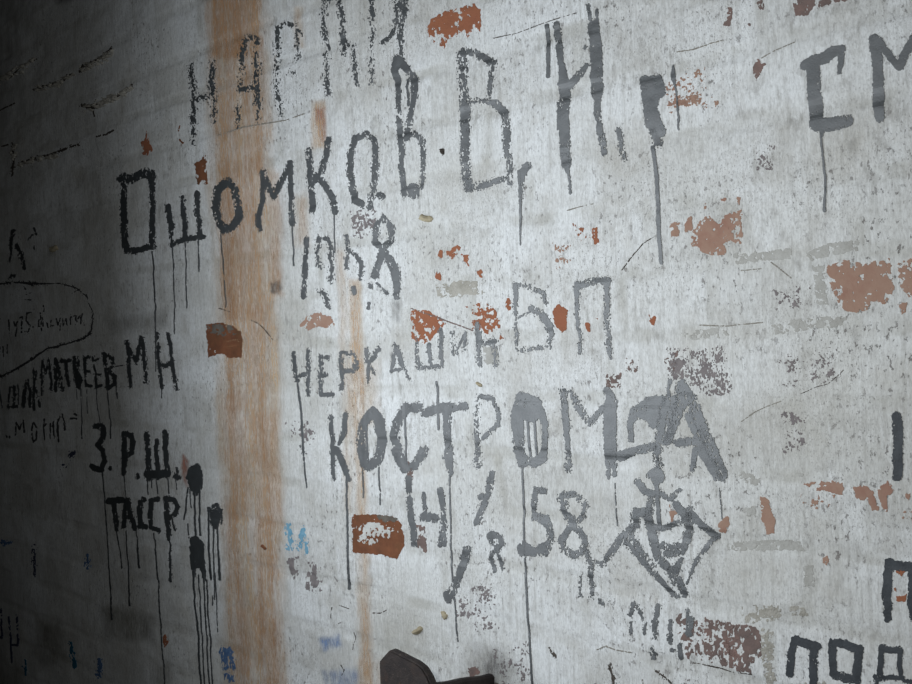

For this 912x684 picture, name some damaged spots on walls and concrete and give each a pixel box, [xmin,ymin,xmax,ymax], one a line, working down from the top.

peeling [427,3,481,48]
peeling [793,0,847,16]
peeling [669,197,792,265]
peeling [206,322,243,358]
rust [212,0,279,684]
peeling [410,309,446,344]
peeling [435,245,511,365]
peeling [771,240,912,335]
peeling [777,347,841,387]
peeling [351,514,405,559]
peeling [441,586,499,635]
peeling [676,604,808,684]